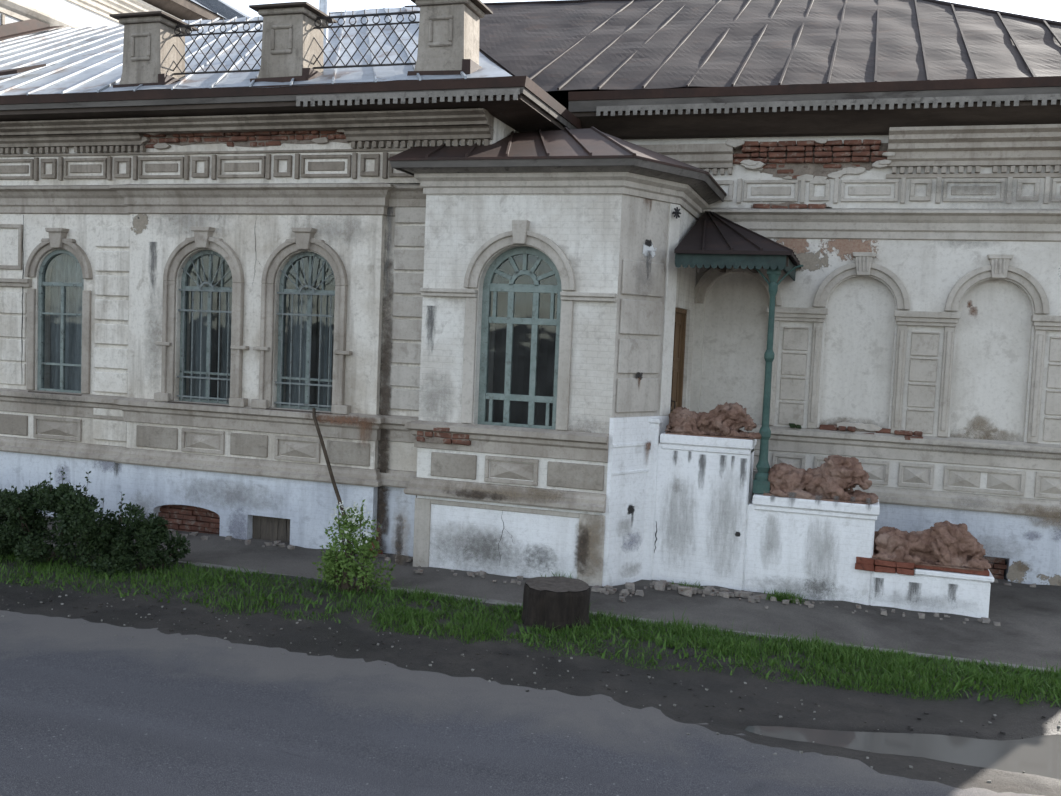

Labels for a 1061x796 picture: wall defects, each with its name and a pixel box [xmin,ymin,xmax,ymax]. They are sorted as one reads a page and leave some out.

spalling [139,129,349,149]
spalling [725,139,895,182]
spalling [750,201,832,209]
peeling [768,238,877,272]
spalling [415,427,471,446]
water stain [674,451,705,477]
water stain [721,455,746,480]
spalling [1007,561,1061,586]